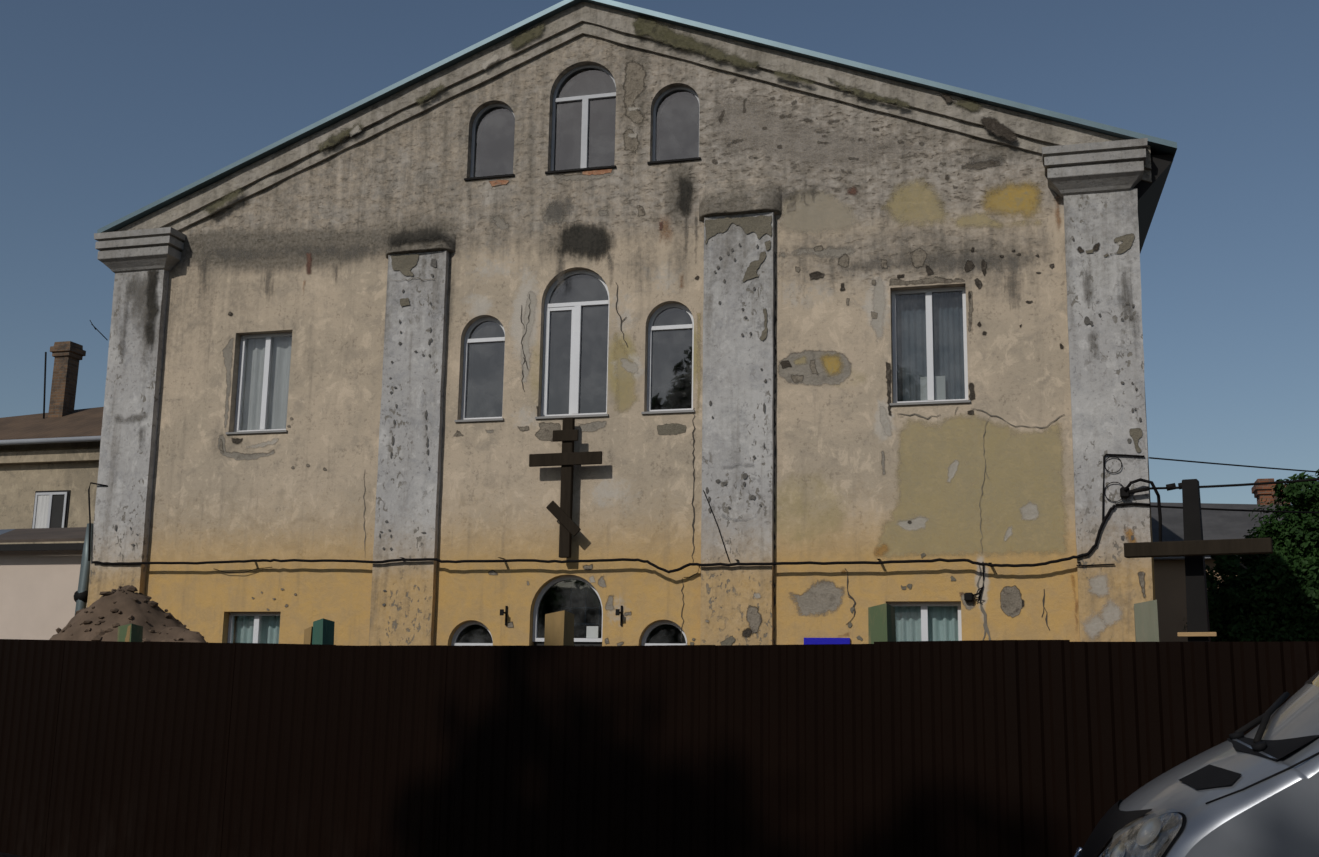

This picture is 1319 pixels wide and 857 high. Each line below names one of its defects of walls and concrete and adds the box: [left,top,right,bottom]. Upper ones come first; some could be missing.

damp [677,178,697,236]
peeling [956,183,1040,227]
damp [547,198,611,283]
damp [121,270,158,355]
peeling [760,350,851,385]
crack [898,407,1065,640]
flaking render [720,593,762,645]
peeling [790,580,863,641]
flaking render [1000,585,1024,617]
flaking render [1084,575,1121,638]